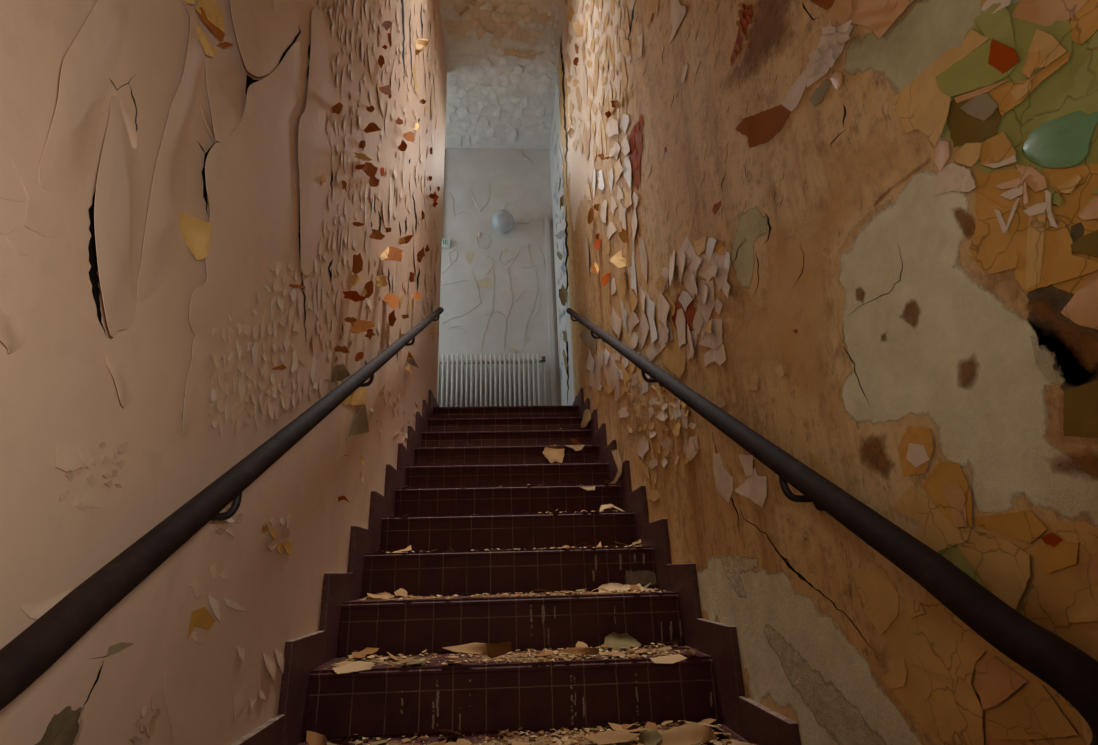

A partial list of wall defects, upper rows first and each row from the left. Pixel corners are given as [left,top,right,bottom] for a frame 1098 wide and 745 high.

peeling [88,76,143,337]
peeling [178,0,440,437]
peeling [542,0,731,502]
crack [0,308,28,354]
flaking render [735,0,1098,661]
peeling [341,385,418,483]
peeling [20,588,72,619]
flaking render [35,642,133,745]
peeling [534,632,696,664]